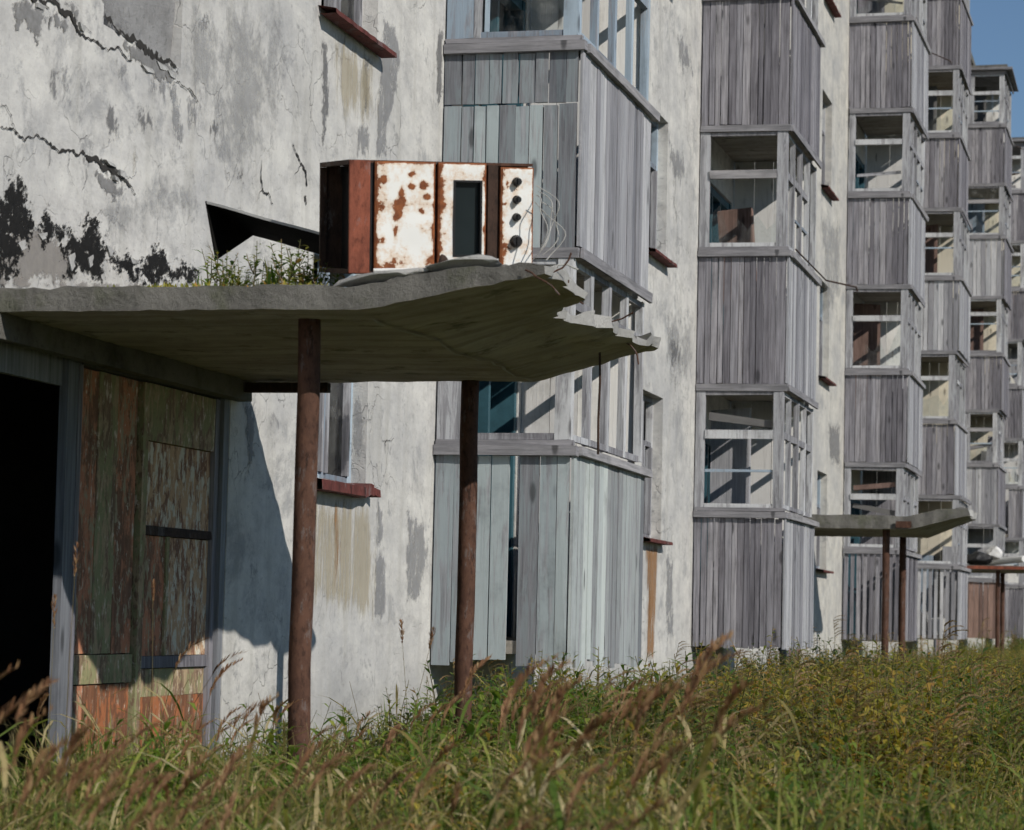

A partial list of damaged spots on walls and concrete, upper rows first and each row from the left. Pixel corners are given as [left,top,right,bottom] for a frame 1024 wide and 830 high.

crack [13,0,132,61]
crack [1,105,136,202]
spalling [525,253,572,295]
leakage [407,512,428,599]
rust [646,546,657,657]